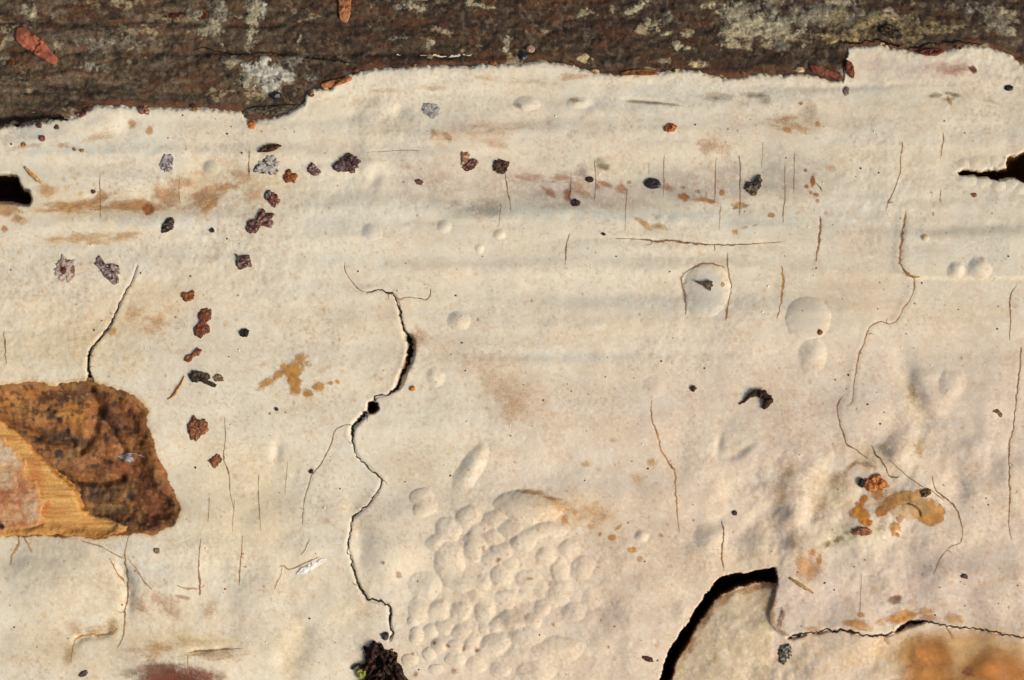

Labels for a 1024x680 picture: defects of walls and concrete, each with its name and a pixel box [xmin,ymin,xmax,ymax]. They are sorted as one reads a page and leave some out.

peeling [422,103,440,119]
crack [87,267,137,377]
peeling [0,377,180,539]
crack [285,264,431,639]
peeling [778,644,792,665]
crack [789,575,1024,643]